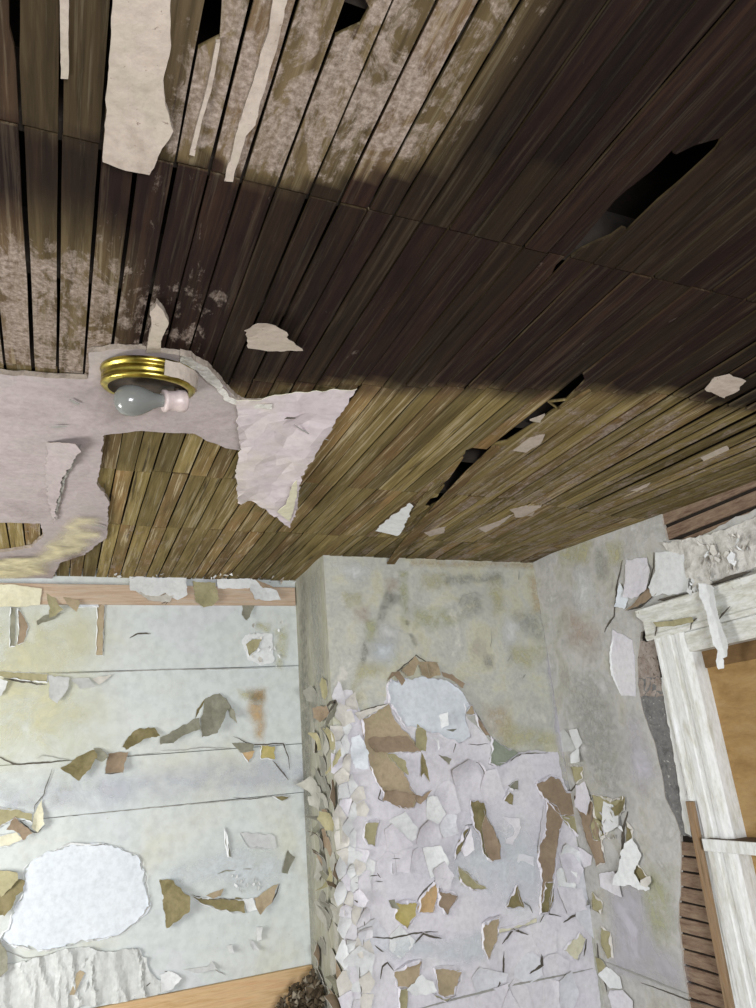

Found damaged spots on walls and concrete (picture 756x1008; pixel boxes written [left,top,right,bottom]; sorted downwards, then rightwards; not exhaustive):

peeling [235,389,357,528]
peeling [0,584,105,656]
peeling [114,573,296,667]
peeling [0,670,111,703]
peeling [61,693,237,781]
crack [128,747,232,756]
peeling [232,481,756,1008]
peeling [0,800,44,848]
peeling [224,828,232,858]
peeling [0,843,295,1008]